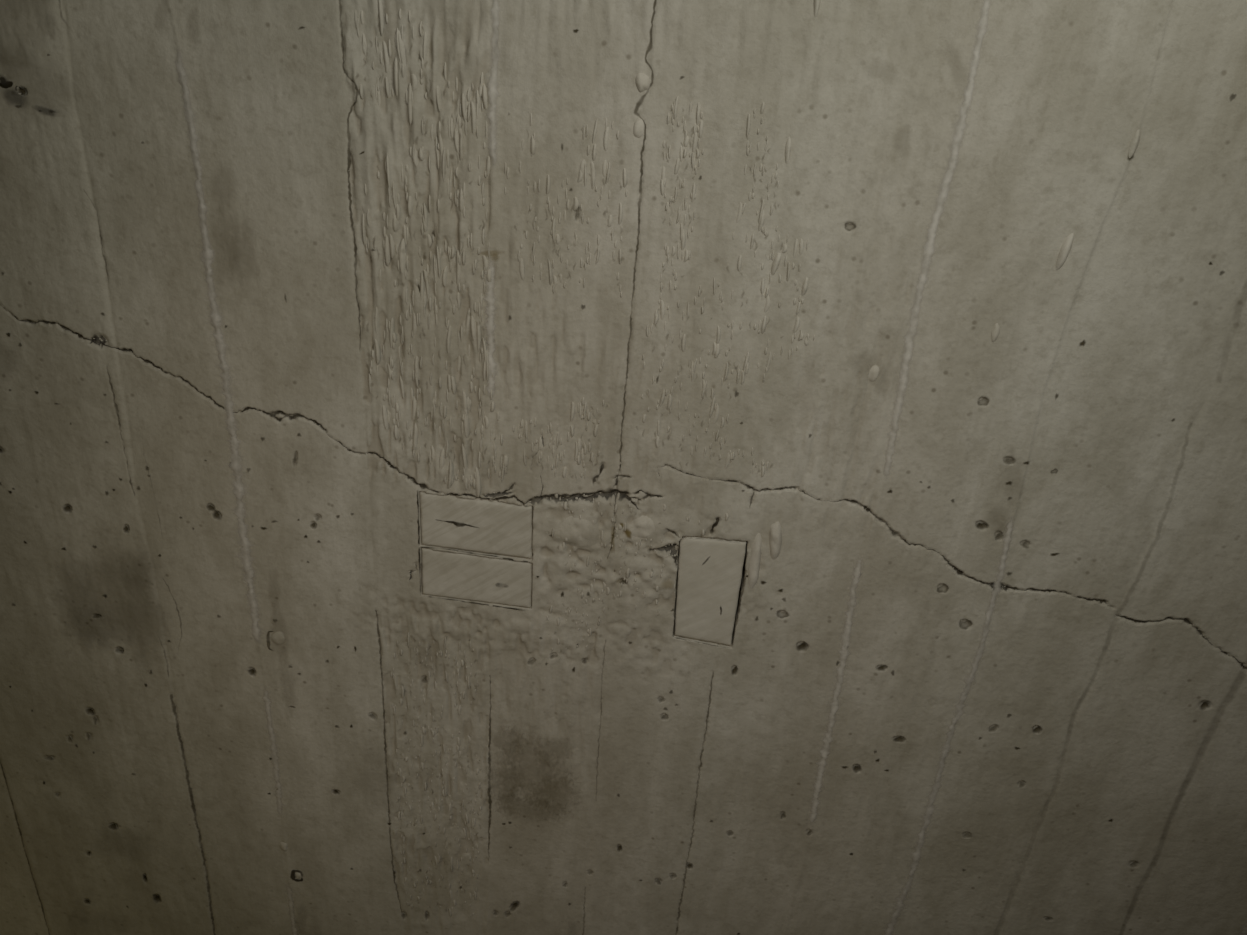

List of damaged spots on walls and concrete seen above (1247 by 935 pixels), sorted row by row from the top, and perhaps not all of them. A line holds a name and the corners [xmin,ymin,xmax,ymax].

crack [14,0,662,550]
crack [670,466,1247,669]